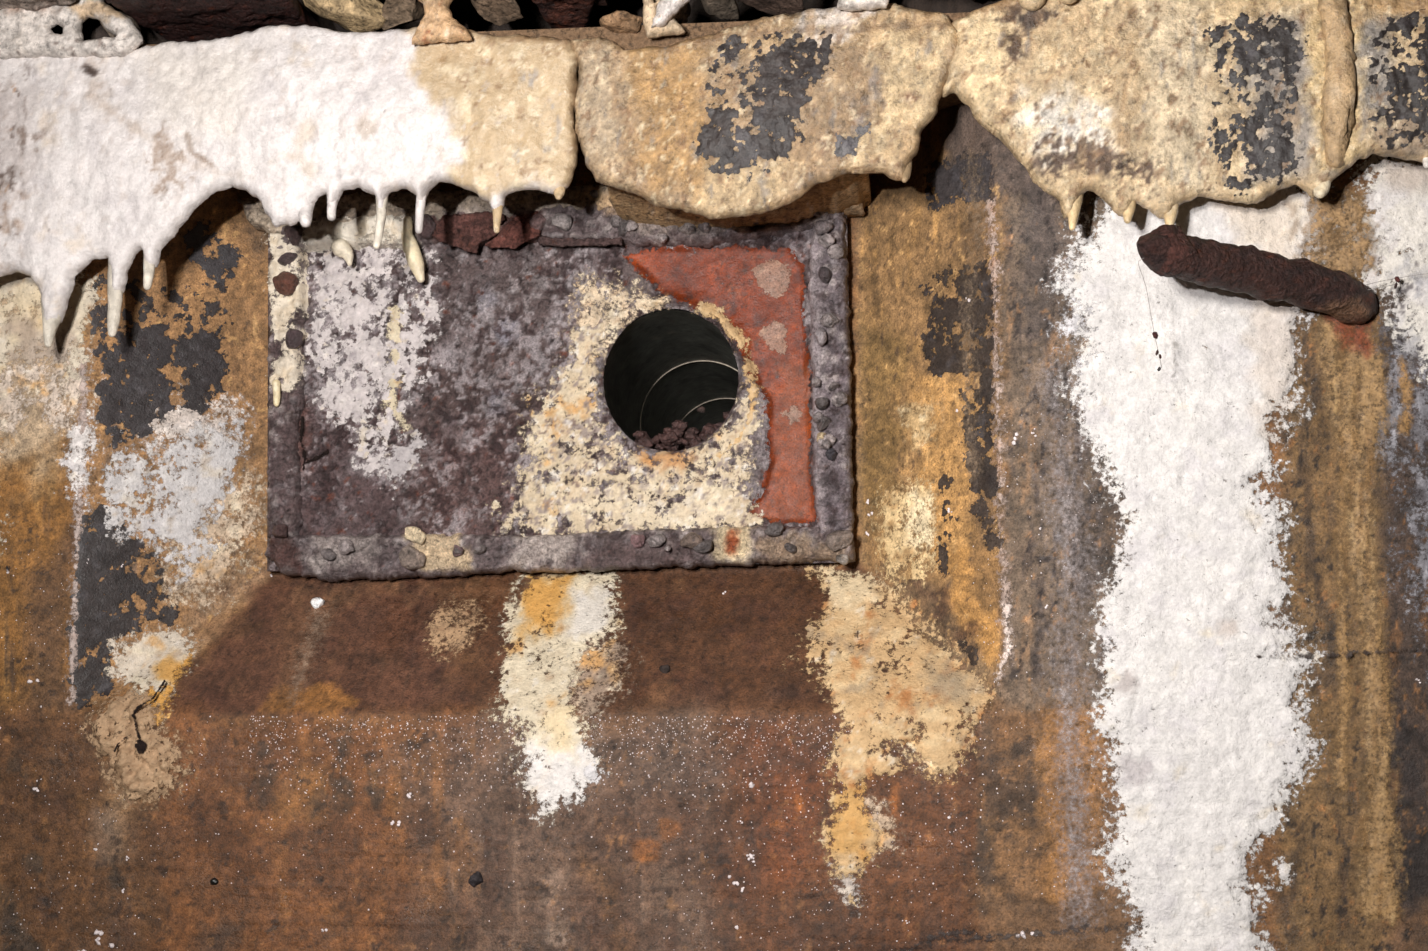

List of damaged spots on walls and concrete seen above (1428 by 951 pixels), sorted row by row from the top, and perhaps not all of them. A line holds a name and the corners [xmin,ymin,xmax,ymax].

corrosion [431,211,623,254]
corrosion [1301,194,1377,275]
efflorescence [488,570,631,825]
efflorescence [782,190,1015,918]
corrosion [1317,313,1412,926]